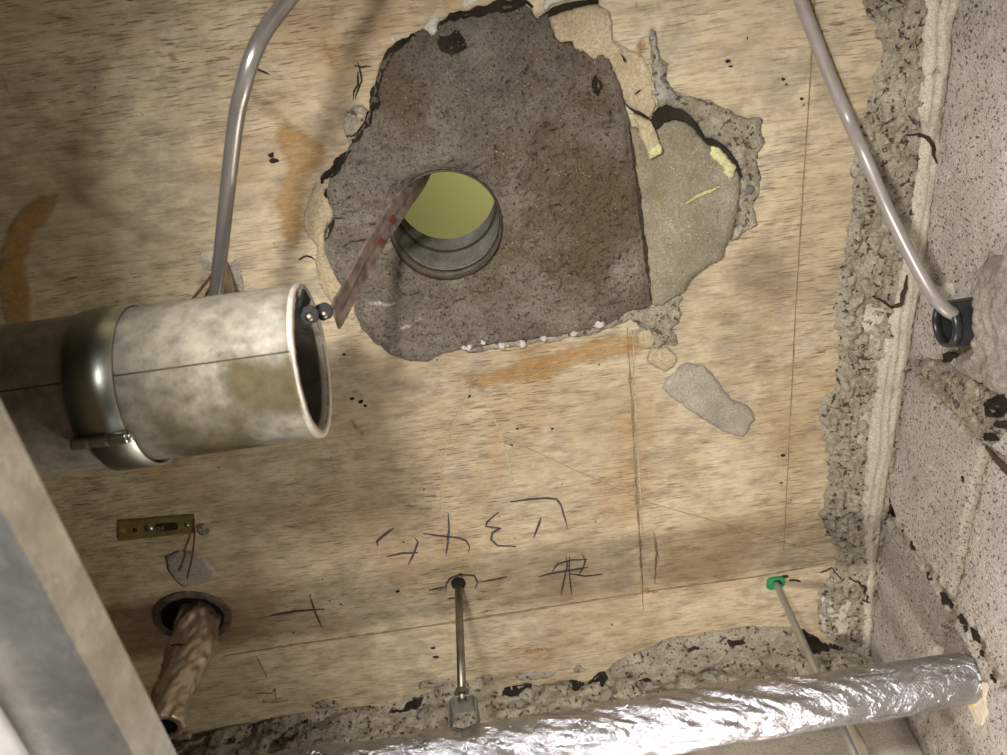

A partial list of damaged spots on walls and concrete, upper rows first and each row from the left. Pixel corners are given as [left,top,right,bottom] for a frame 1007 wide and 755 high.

flaking render [343,105,367,136]
spalling [550,4,765,242]
flaking render [303,182,341,302]
rust [468,337,644,385]
spalling [461,295,684,371]